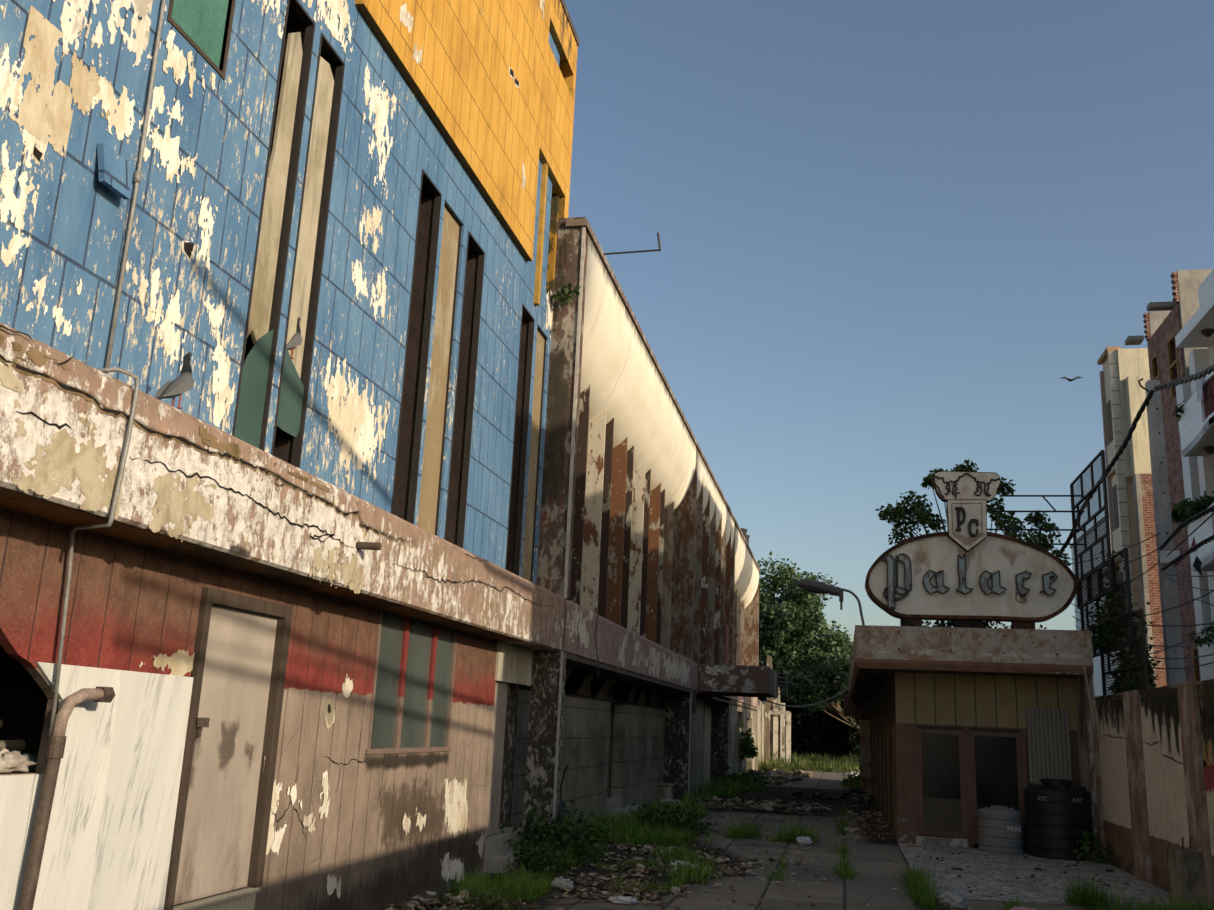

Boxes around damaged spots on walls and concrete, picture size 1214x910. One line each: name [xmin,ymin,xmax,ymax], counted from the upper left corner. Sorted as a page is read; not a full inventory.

peeling [303,0,356,62]
peeling [0,0,218,339]
peeling [352,63,397,324]
peeling [314,336,390,480]
crack [0,322,584,648]
peeling [139,650,195,676]
water stain [1096,695,1124,733]
water stain [1139,688,1180,753]
water stain [1197,683,1214,763]
peeling [266,770,330,855]
peeling [403,808,426,835]
peeling [443,778,487,860]